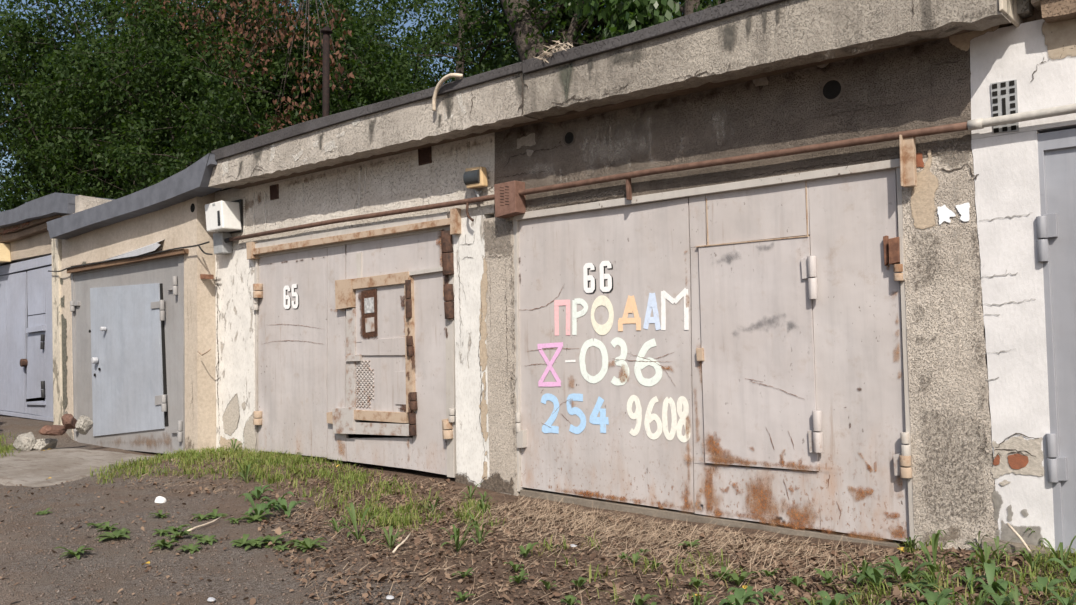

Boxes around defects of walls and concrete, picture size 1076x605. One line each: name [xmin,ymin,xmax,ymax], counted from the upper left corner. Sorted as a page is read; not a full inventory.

damp [723,8,780,50]
spalling [916,139,969,167]
peeling [220,394,256,451]
rust [683,408,753,516]
rust [725,480,832,534]
spalling [991,433,1044,547]